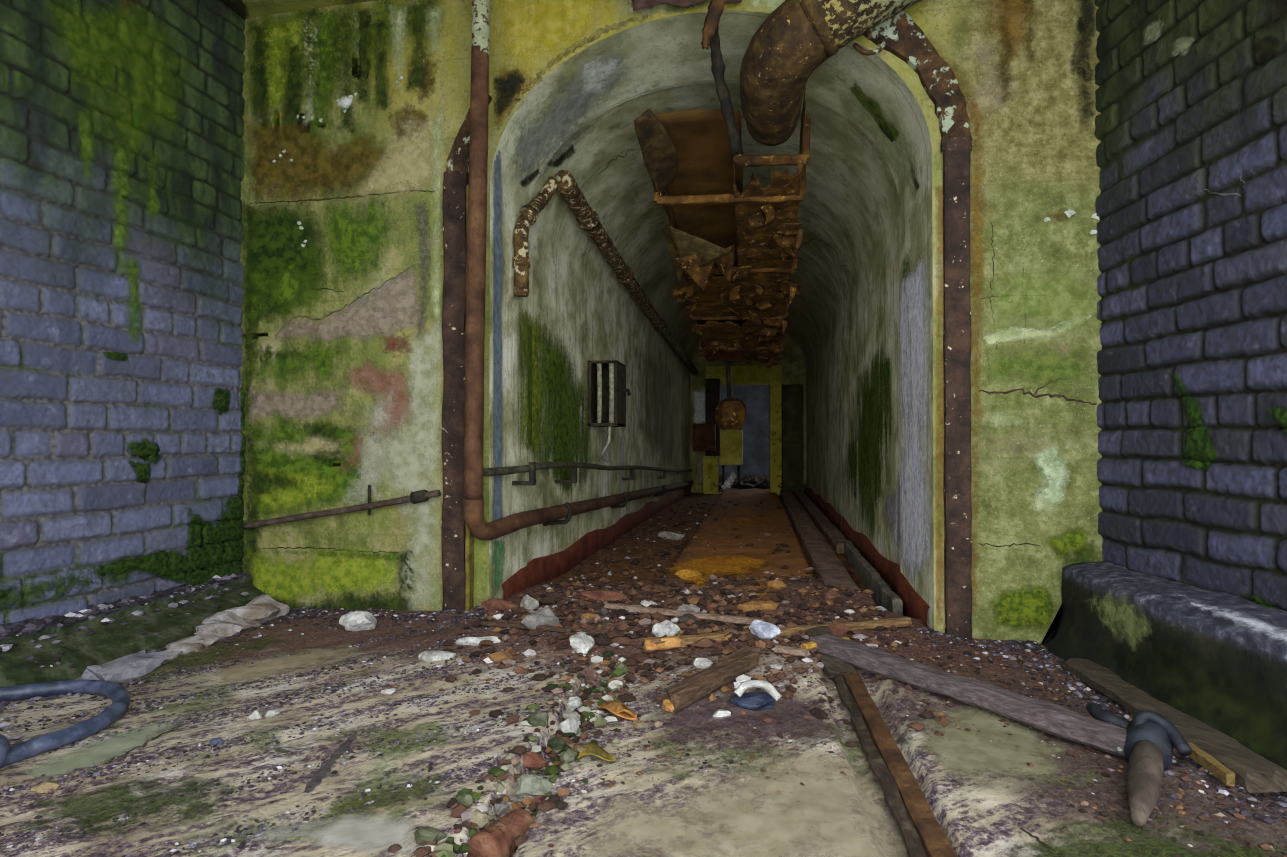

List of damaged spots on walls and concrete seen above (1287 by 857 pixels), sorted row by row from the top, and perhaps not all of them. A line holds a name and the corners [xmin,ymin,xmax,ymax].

corrosion [991,0,1033,101]
leakage [249,0,442,607]
leakage [848,361,889,500]